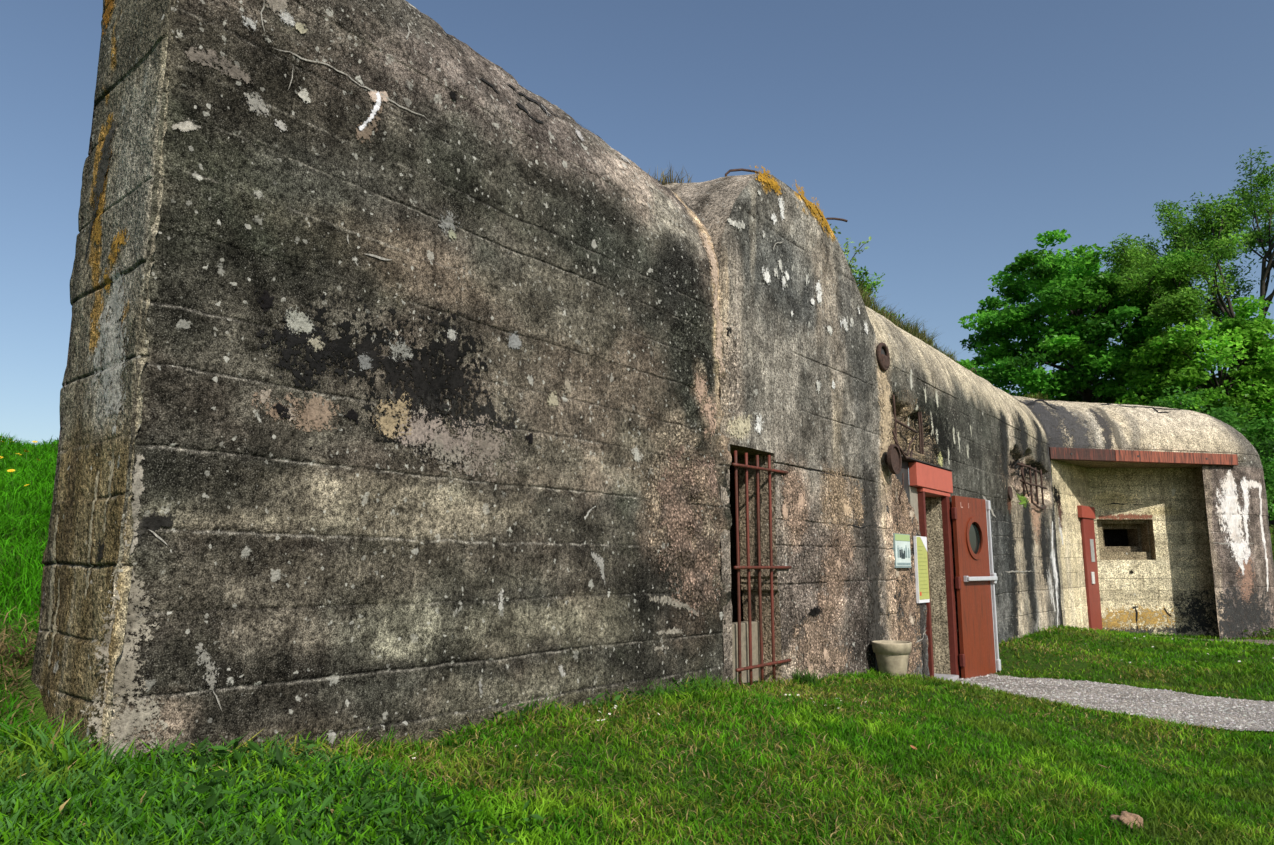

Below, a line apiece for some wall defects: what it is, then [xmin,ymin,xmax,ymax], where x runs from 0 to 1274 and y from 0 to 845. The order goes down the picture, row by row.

crack [261,0,431,122]
mould [256,293,528,468]
peeling [1215,469,1269,591]